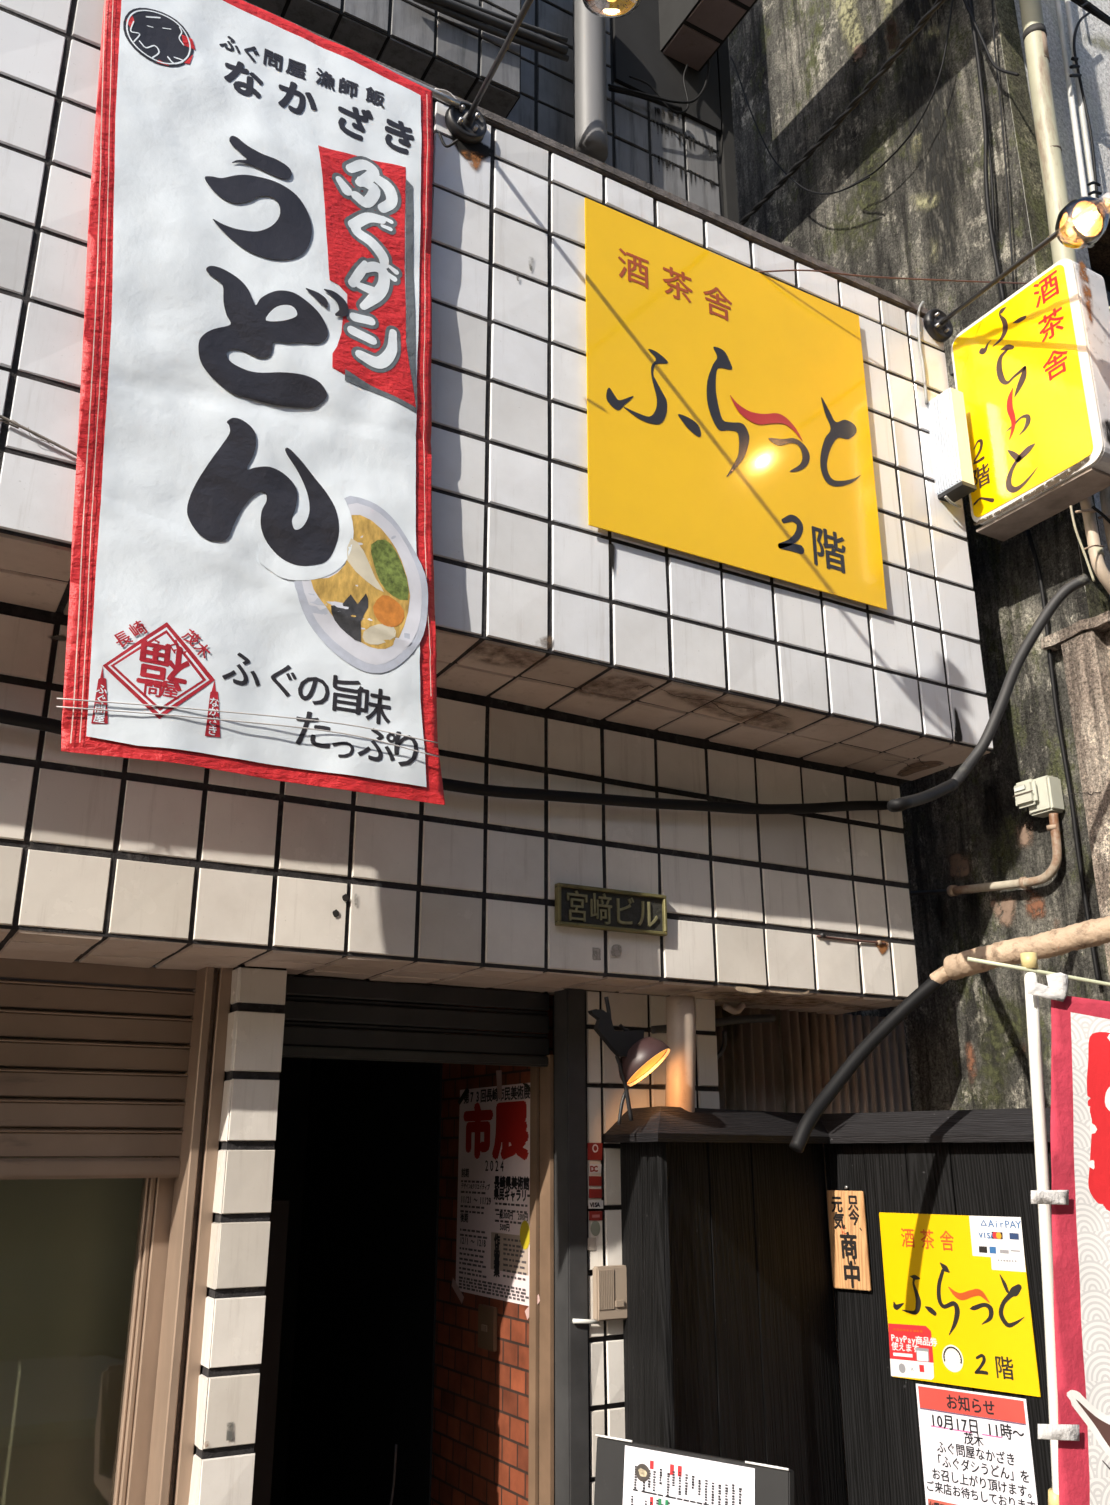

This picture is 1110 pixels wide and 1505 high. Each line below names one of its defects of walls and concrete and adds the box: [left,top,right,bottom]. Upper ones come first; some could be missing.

leakage [901,0,958,275]
leakage [475,636,552,665]